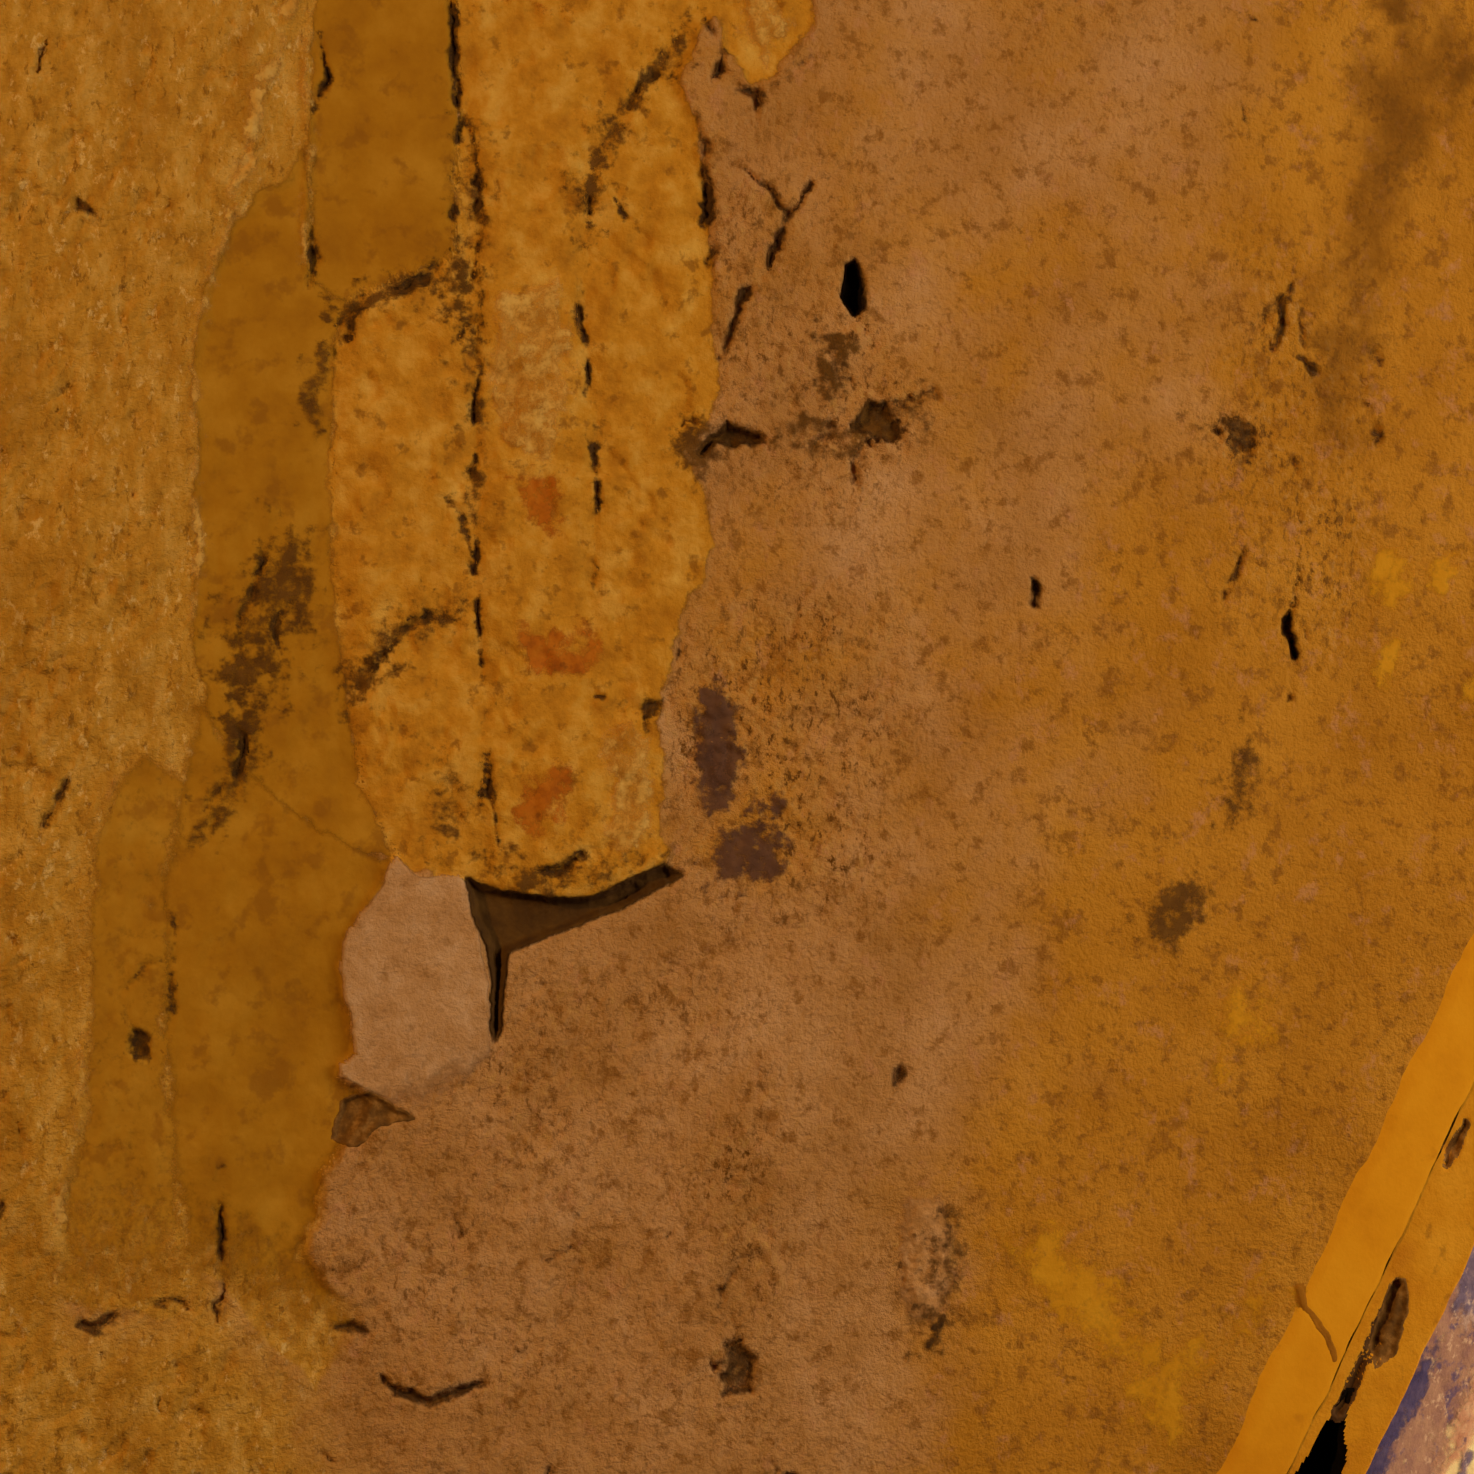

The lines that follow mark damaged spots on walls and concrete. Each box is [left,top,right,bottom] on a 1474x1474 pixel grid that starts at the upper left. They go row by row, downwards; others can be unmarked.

crack [334,4,487,686]
crack [696,117,717,265]
crack [718,168,811,359]
spalling [842,260,866,316]
spalling [815,391,938,457]
spalling [130,0,816,1340]
damp [688,673,794,896]
damp [1130,881,1211,952]
spalling [893,1068,905,1087]
crack [1437,1118,1471,1169]
spalling [712,1344,755,1395]
crack [1293,1277,1409,1474]